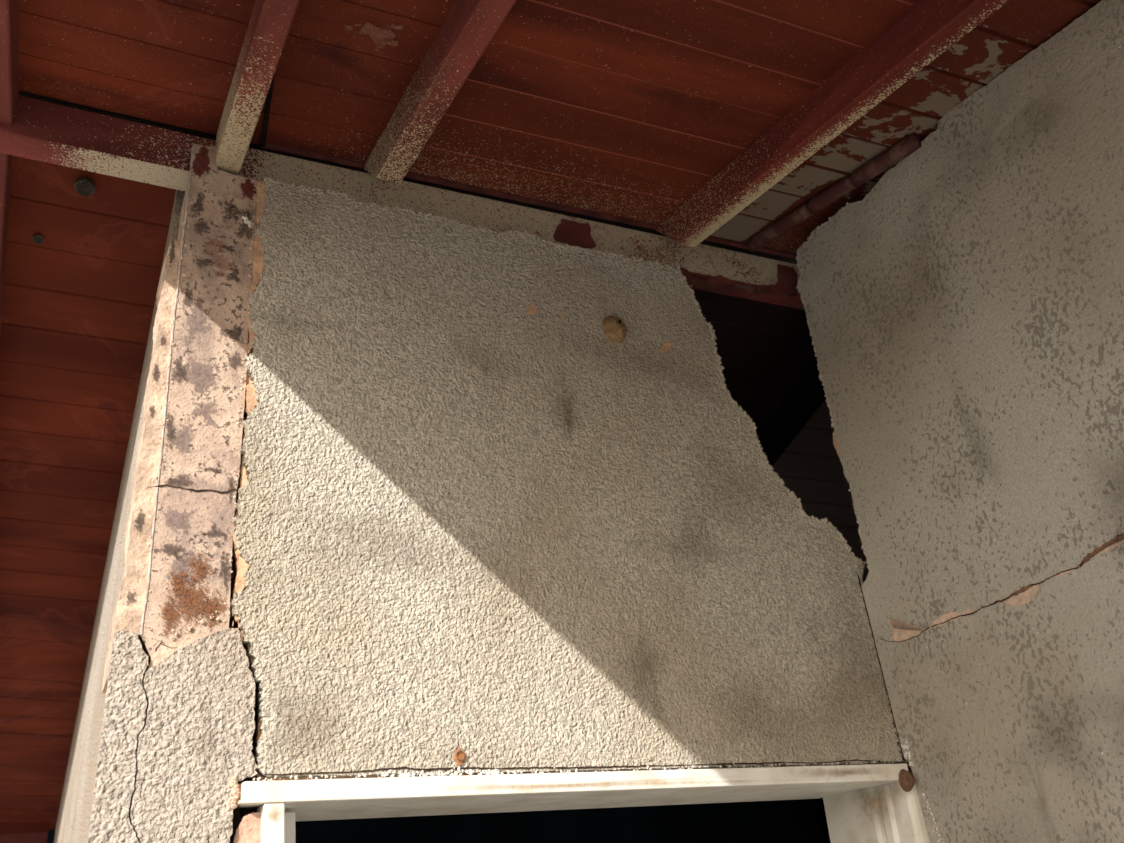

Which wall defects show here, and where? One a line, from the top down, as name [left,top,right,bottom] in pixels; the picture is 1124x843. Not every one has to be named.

peeling [191,144,211,179]
spalling [236,215,255,430]
peeling [240,177,869,567]
crack [129,634,161,843]
spalling [148,602,227,669]
rust [159,549,230,639]
rust [453,746,466,766]
crack [148,180,1124,843]